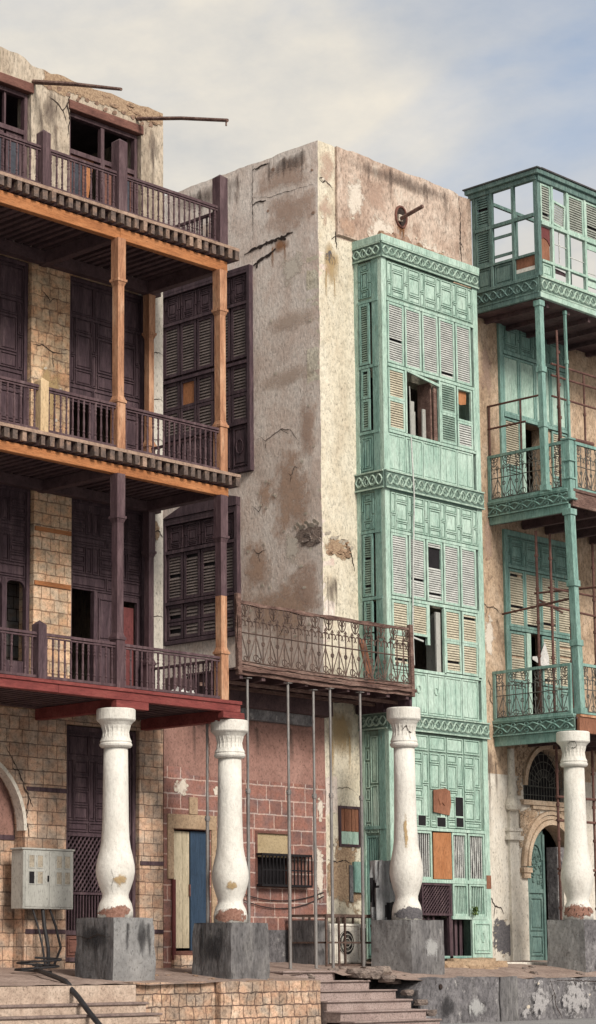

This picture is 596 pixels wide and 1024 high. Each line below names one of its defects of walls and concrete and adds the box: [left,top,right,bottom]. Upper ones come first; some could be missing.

crack [244,163,331,268]
peeling [257,405,355,571]
peeling [174,778,189,796]
peeling [97,905,132,918]
peeling [213,908,247,922]
peeling [522,980,596,1018]